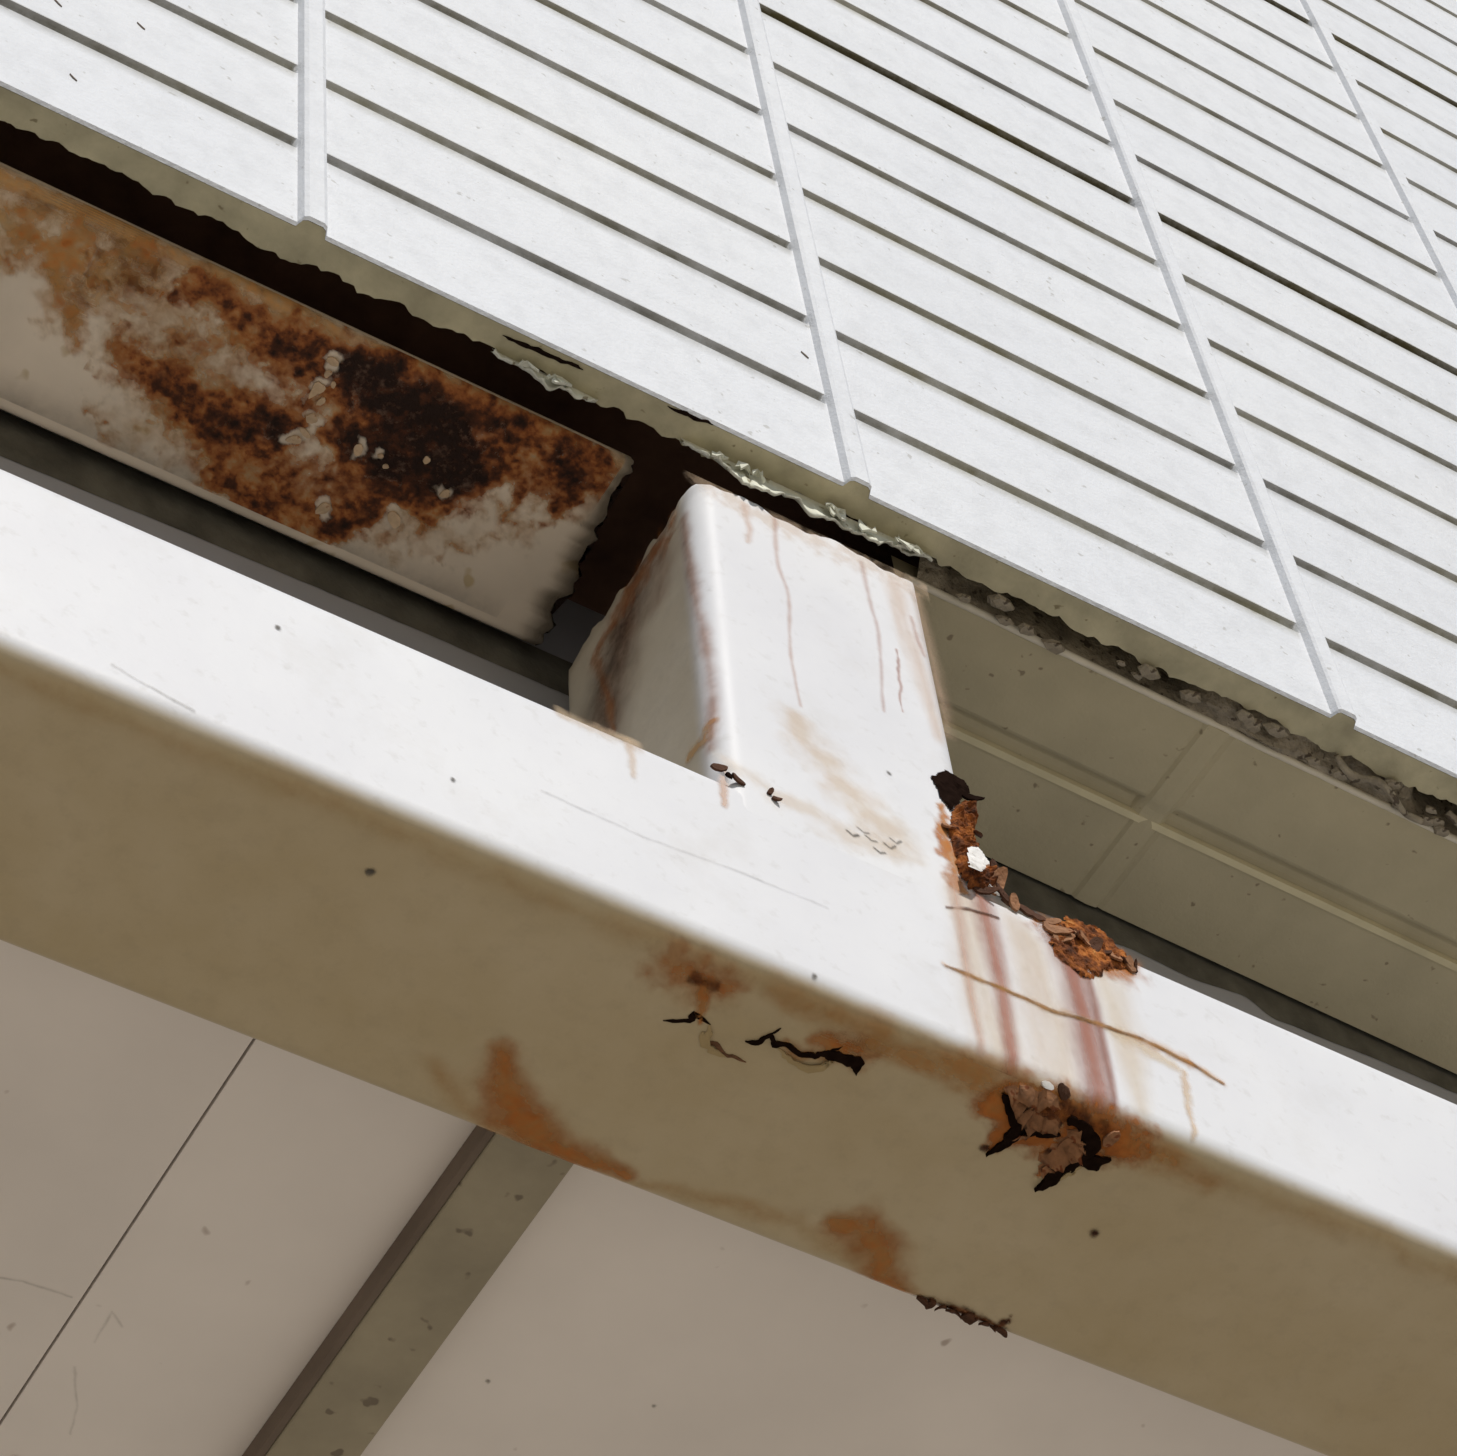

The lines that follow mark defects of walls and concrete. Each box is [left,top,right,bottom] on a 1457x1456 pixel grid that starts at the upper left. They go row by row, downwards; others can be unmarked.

corrosion [0,168,620,545]
peeling [962,793,985,801]
peeling [941,822,1020,912]
crack [663,1011,865,1076]
corrosion [977,893,1138,1113]
corrosion [487,1049,633,1180]
corrosion [827,1218,906,1292]